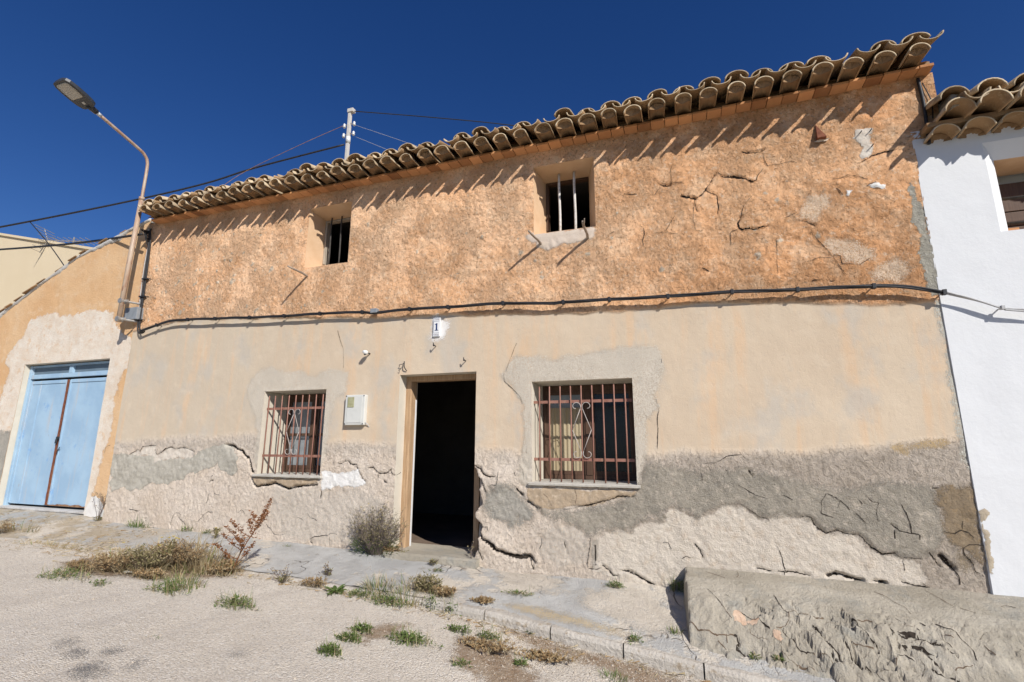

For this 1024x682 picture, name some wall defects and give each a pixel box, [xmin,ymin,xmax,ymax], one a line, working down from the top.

crack [836,149,897,198]
crack [629,150,868,282]
flaking render [0,309,132,509]
flaking render [131,444,194,463]
flaking render [252,476,391,546]
spalling [527,486,637,510]
flaking render [537,504,928,588]
crack [666,454,996,682]